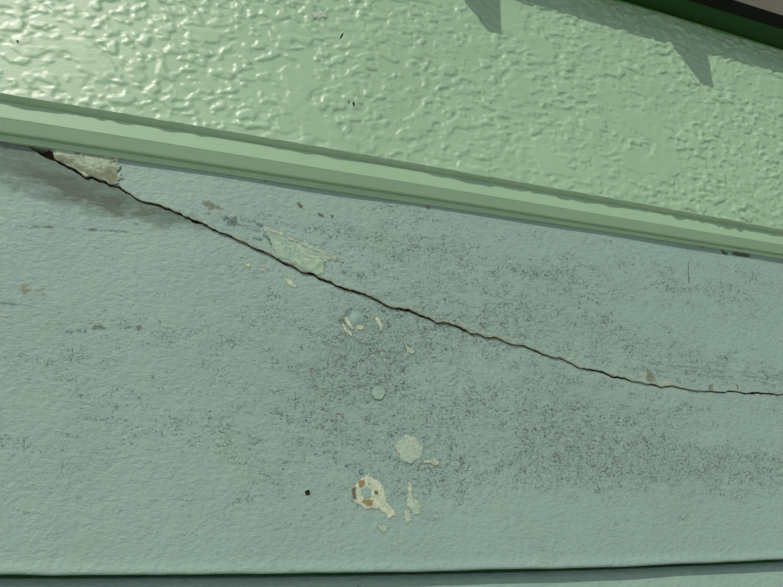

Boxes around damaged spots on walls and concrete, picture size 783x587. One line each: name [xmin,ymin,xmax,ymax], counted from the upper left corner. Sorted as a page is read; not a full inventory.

spalling [53,149,123,184]
peeling [262,226,344,275]
crack [36,149,783,396]
peeling [394,434,439,465]
peeling [352,474,422,533]